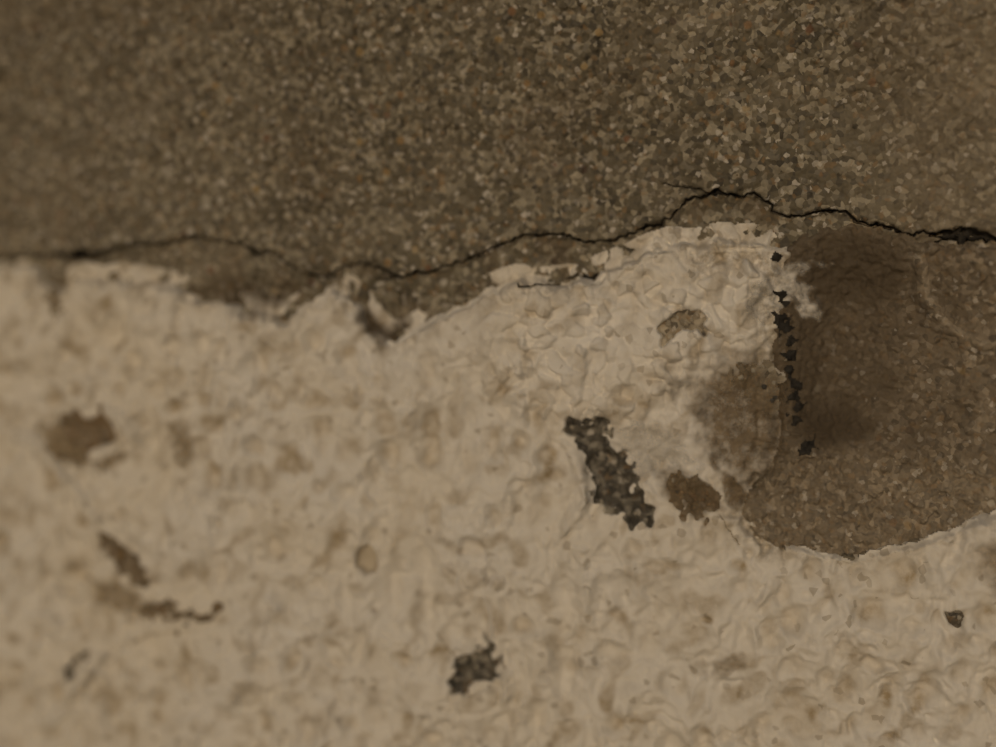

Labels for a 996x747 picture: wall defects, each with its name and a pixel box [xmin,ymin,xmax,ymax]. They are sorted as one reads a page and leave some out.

crack [0,183,996,280]
peeling [384,247,687,347]
crack [517,272,599,287]
spalling [658,310,707,346]
spalling [728,219,996,563]
spalling [47,403,121,461]
spalling [564,416,655,531]
spalling [666,469,722,526]
spalling [99,531,150,589]
spalling [139,597,224,636]
hole [64,650,90,681]
hole [447,633,506,714]